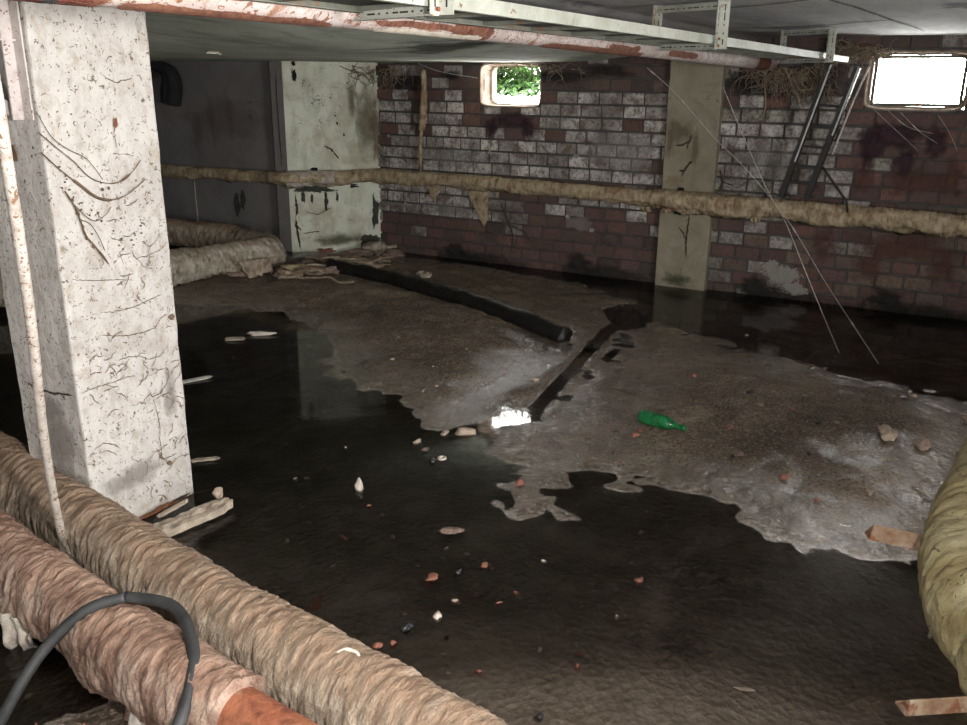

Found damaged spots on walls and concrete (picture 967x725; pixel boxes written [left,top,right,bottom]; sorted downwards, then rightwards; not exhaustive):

rust [54,0,332,27]
rust [376,20,495,41]
rust [539,43,644,57]
rust [755,58,772,70]
leakage [279,61,337,125]
leakage [349,90,379,152]
crack [676,135,693,175]
leakage [860,124,947,175]
leakage [293,186,339,211]
leakage [319,193,381,245]
crack [679,215,690,254]
crack [25,199,189,499]